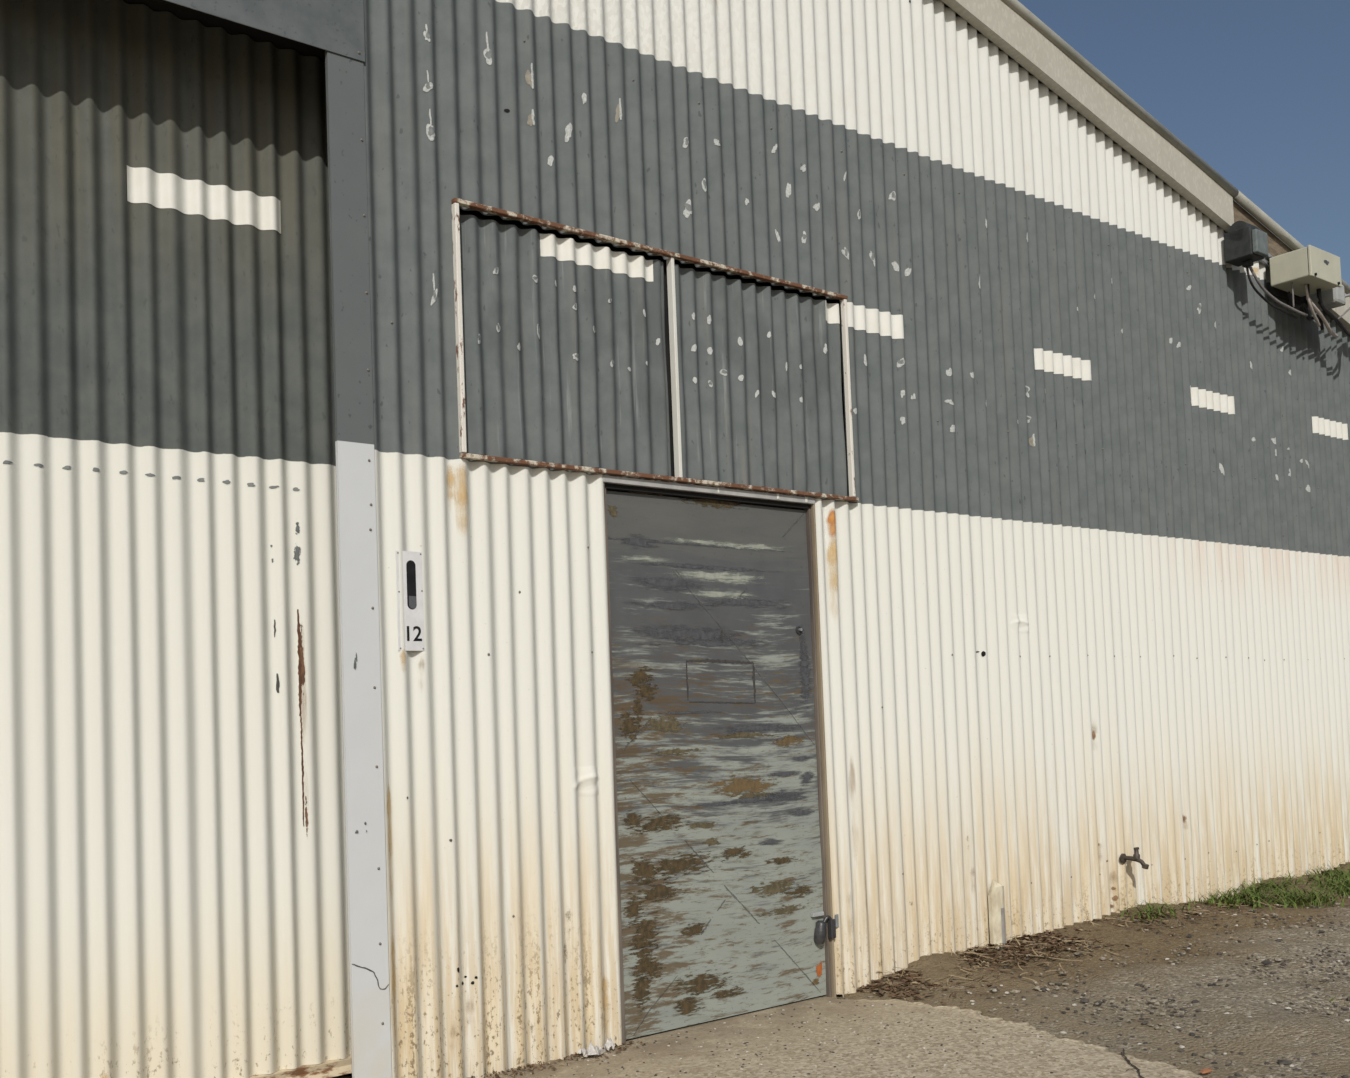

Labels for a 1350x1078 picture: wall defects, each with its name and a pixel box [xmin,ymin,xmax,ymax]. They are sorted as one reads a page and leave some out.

peeling [484,32,492,65]
peeling [525,63,534,89]
peeling [426,109,435,141]
peeling [683,199,692,218]
peeling [693,369,744,387]
corrosion [828,511,837,587]
corrosion [297,609,308,832]
corrosion [619,666,699,756]
corrosion [719,732,803,747]
corrosion [708,775,779,799]
corrosion [623,810,798,1016]
corrosion [750,878,814,917]